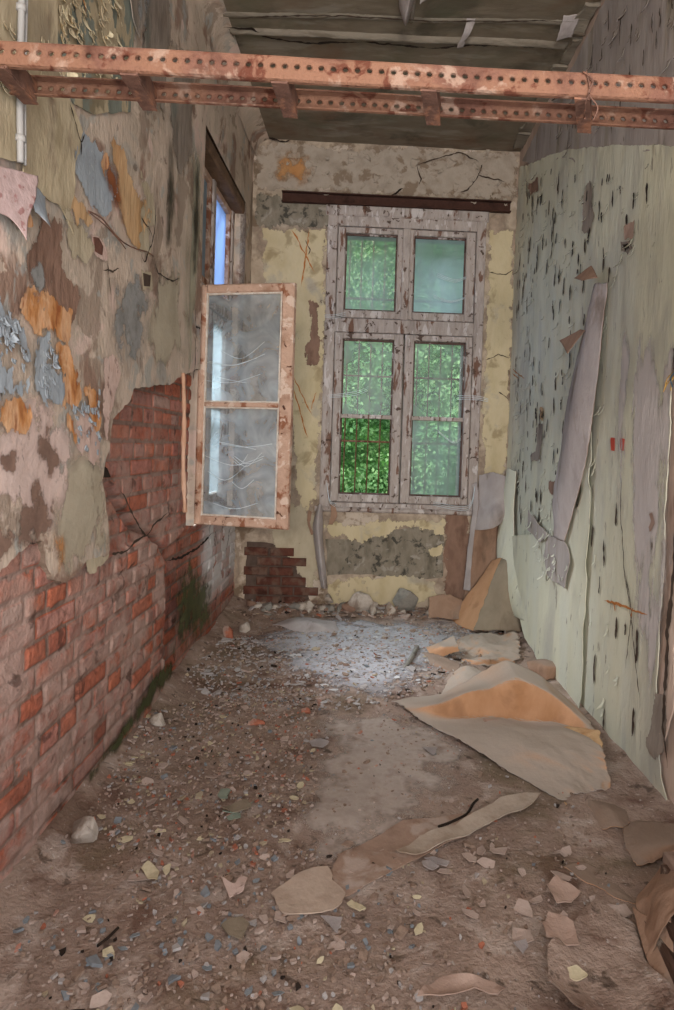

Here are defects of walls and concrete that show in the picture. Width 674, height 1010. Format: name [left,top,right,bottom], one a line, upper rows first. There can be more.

peeling [0,0,190,63]
peeling [569,0,674,89]
crack [392,152,504,195]
spalling [0,70,470,883]
peeling [253,98,674,800]
crack [112,492,167,555]
crack [168,533,212,561]